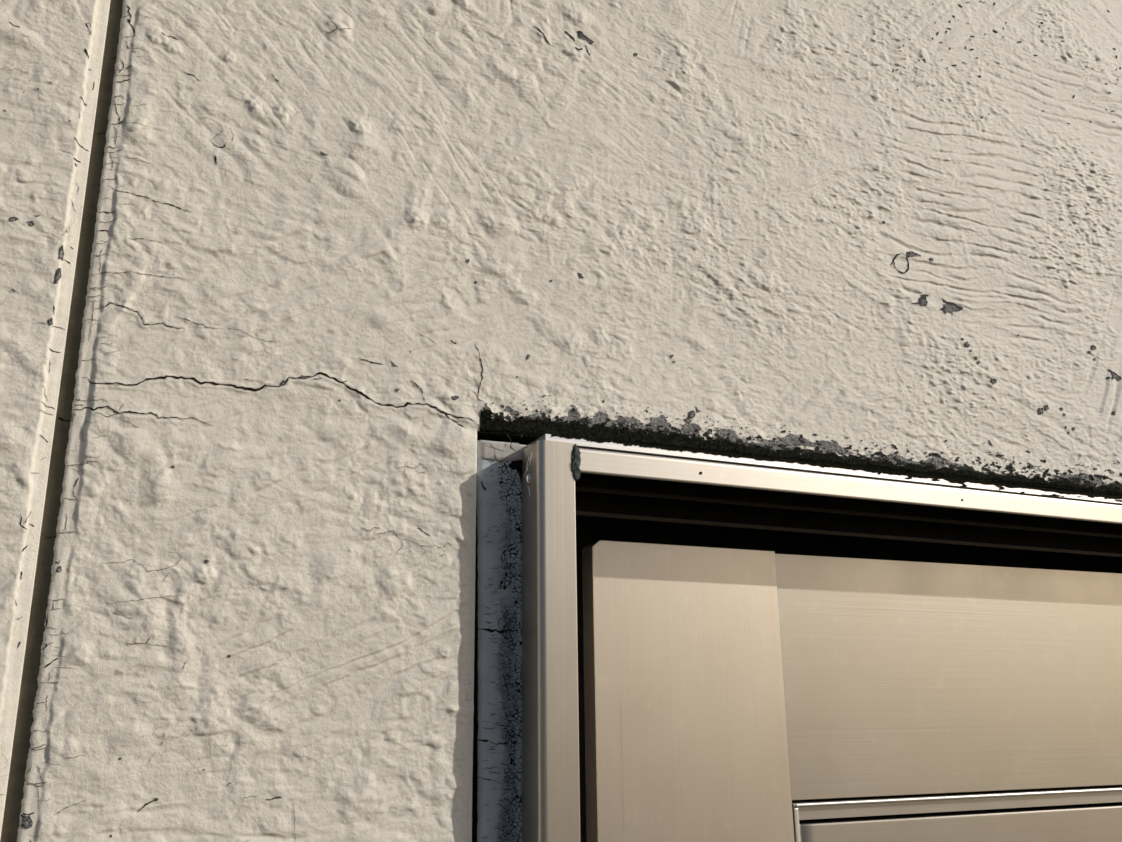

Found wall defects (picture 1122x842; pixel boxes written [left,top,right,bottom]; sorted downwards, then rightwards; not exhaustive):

crack [0,5,523,842]
damp [479,389,1122,502]